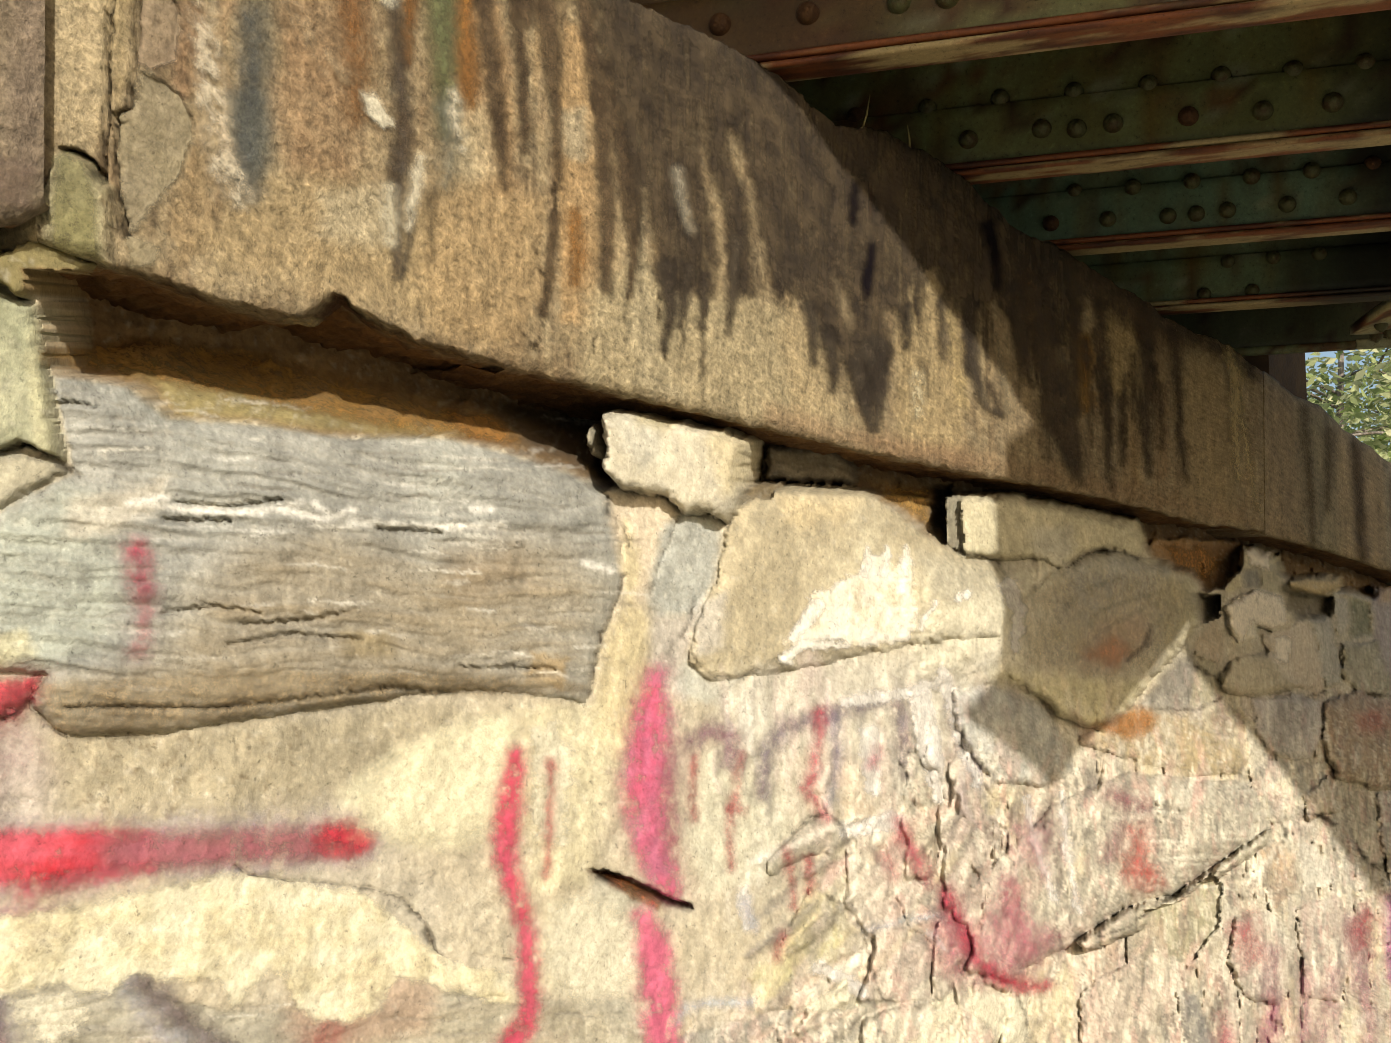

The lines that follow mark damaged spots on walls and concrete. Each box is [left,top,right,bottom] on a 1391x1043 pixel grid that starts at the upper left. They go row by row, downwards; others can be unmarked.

damp [195,0,259,203]
damp [362,0,461,275]
damp [475,0,563,191]
spalling [264,296,467,360]
damp [540,210,560,316]
damp [578,0,1259,512]
peeling [778,546,938,665]
crack [1284,813,1388,868]